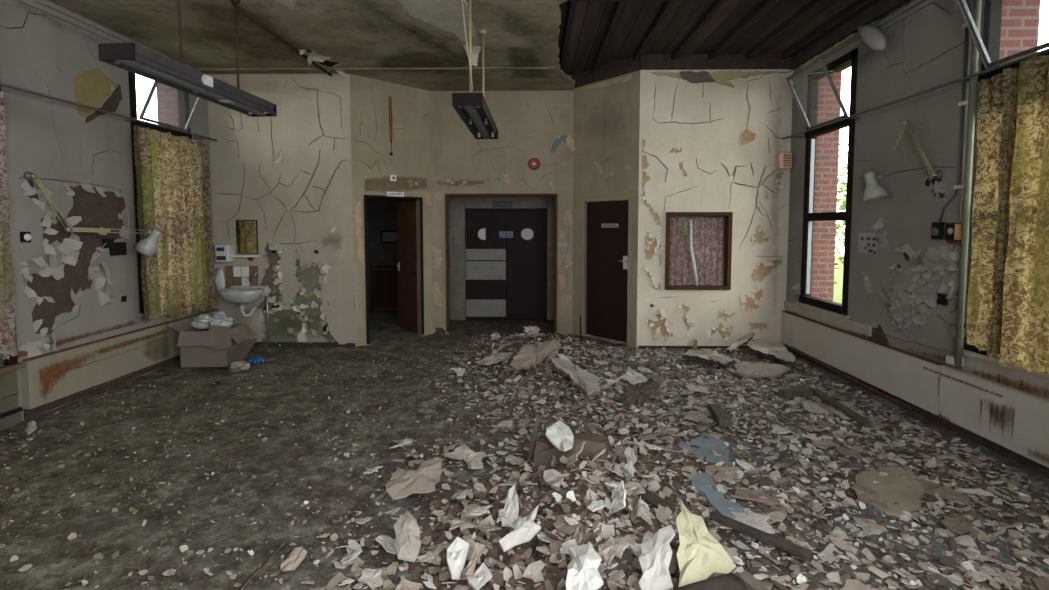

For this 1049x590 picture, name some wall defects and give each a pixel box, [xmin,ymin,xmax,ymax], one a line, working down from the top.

peeling [18,173,130,358]
rust [40,331,170,407]
crack [216,79,389,252]
peeling [260,200,364,347]
peeling [625,138,694,344]
crack [643,75,791,257]
peeling [705,254,784,341]
peeling [740,129,756,145]